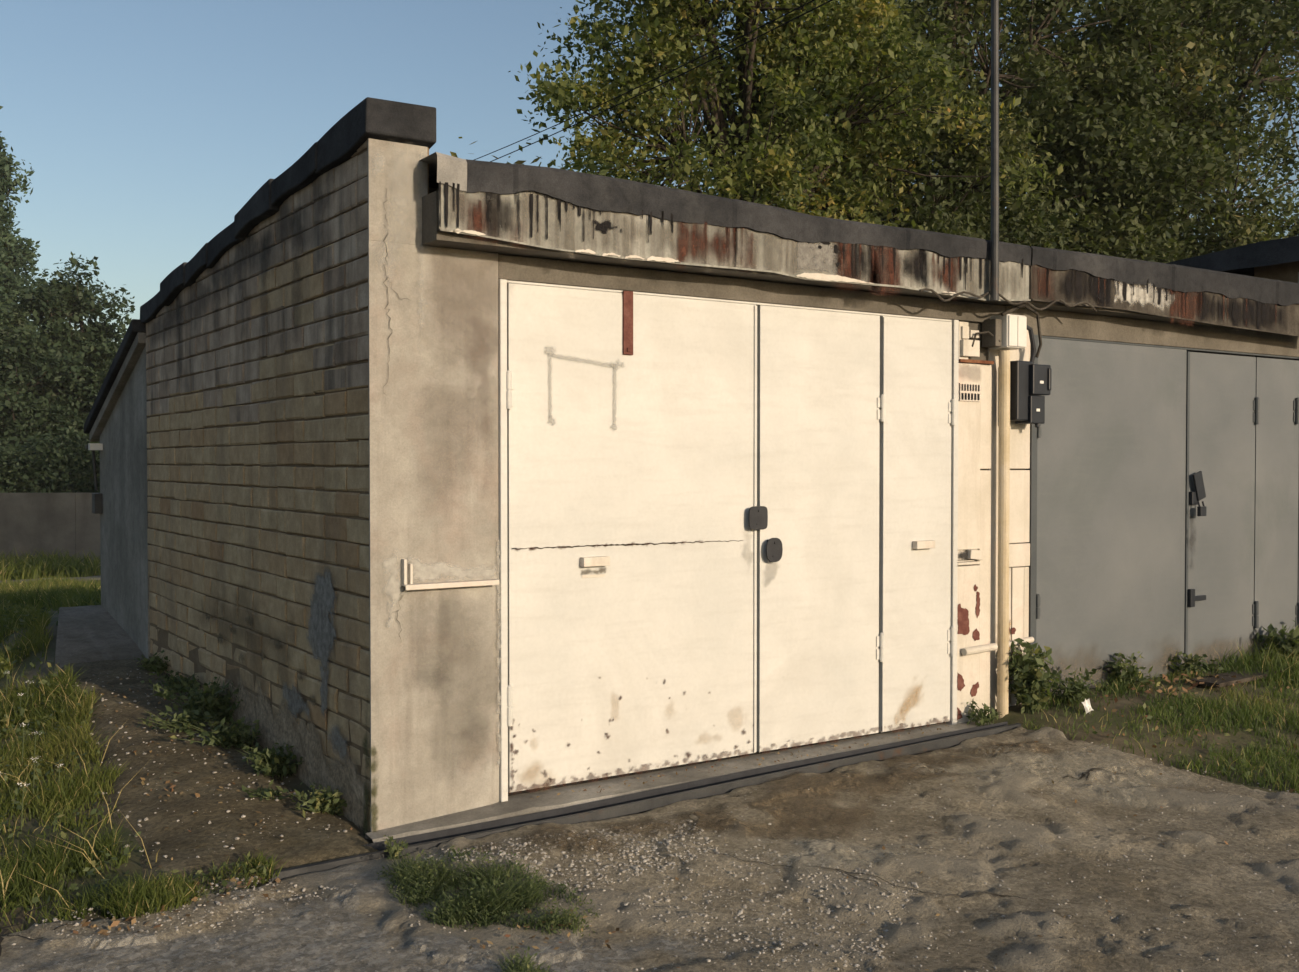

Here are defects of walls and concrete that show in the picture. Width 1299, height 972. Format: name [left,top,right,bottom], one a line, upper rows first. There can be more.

rust [468,200,496,234]
rust [678,222,753,264]
crack [383,189,405,387]
rust [837,242,900,295]
rust [933,254,960,293]